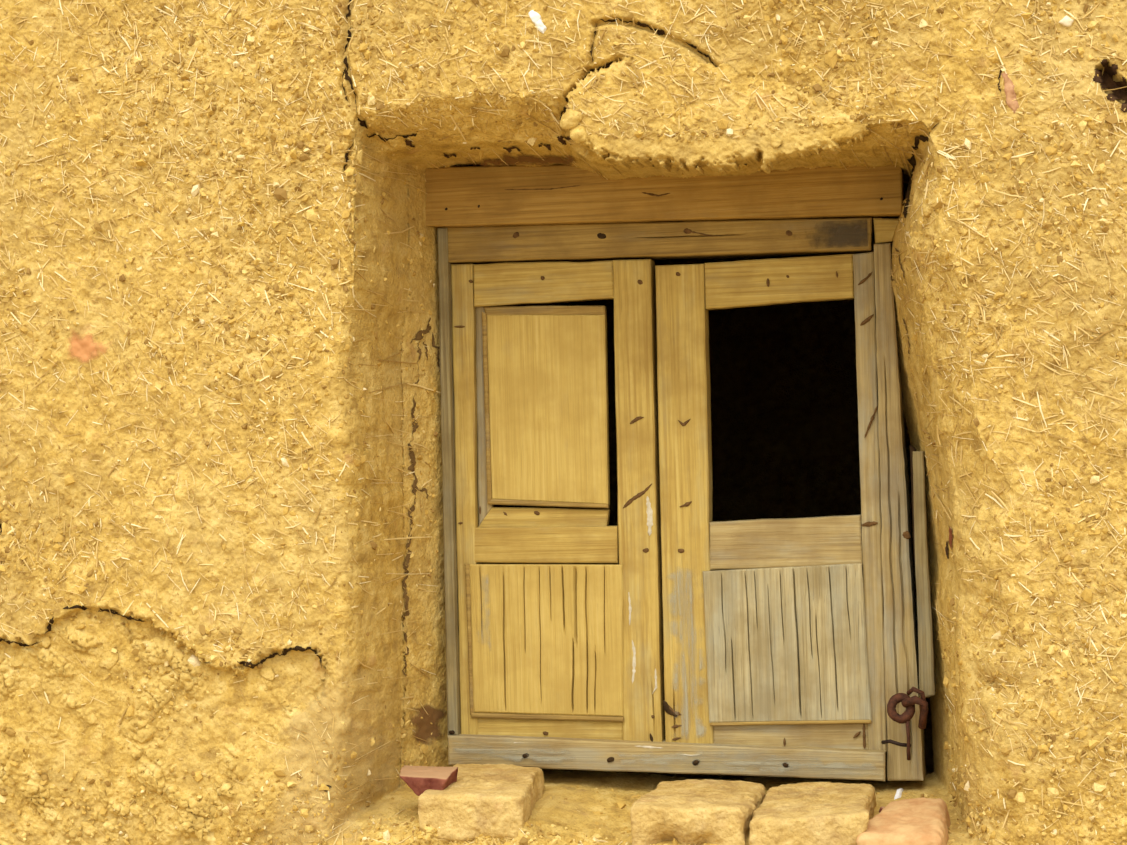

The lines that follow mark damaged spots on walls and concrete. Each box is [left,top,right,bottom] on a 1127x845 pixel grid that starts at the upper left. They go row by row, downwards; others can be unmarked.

crack [342,0,417,170]
crack [560,18,716,120]
crack [402,318,440,677]
crack [0,605,144,647]
crack [203,646,322,669]